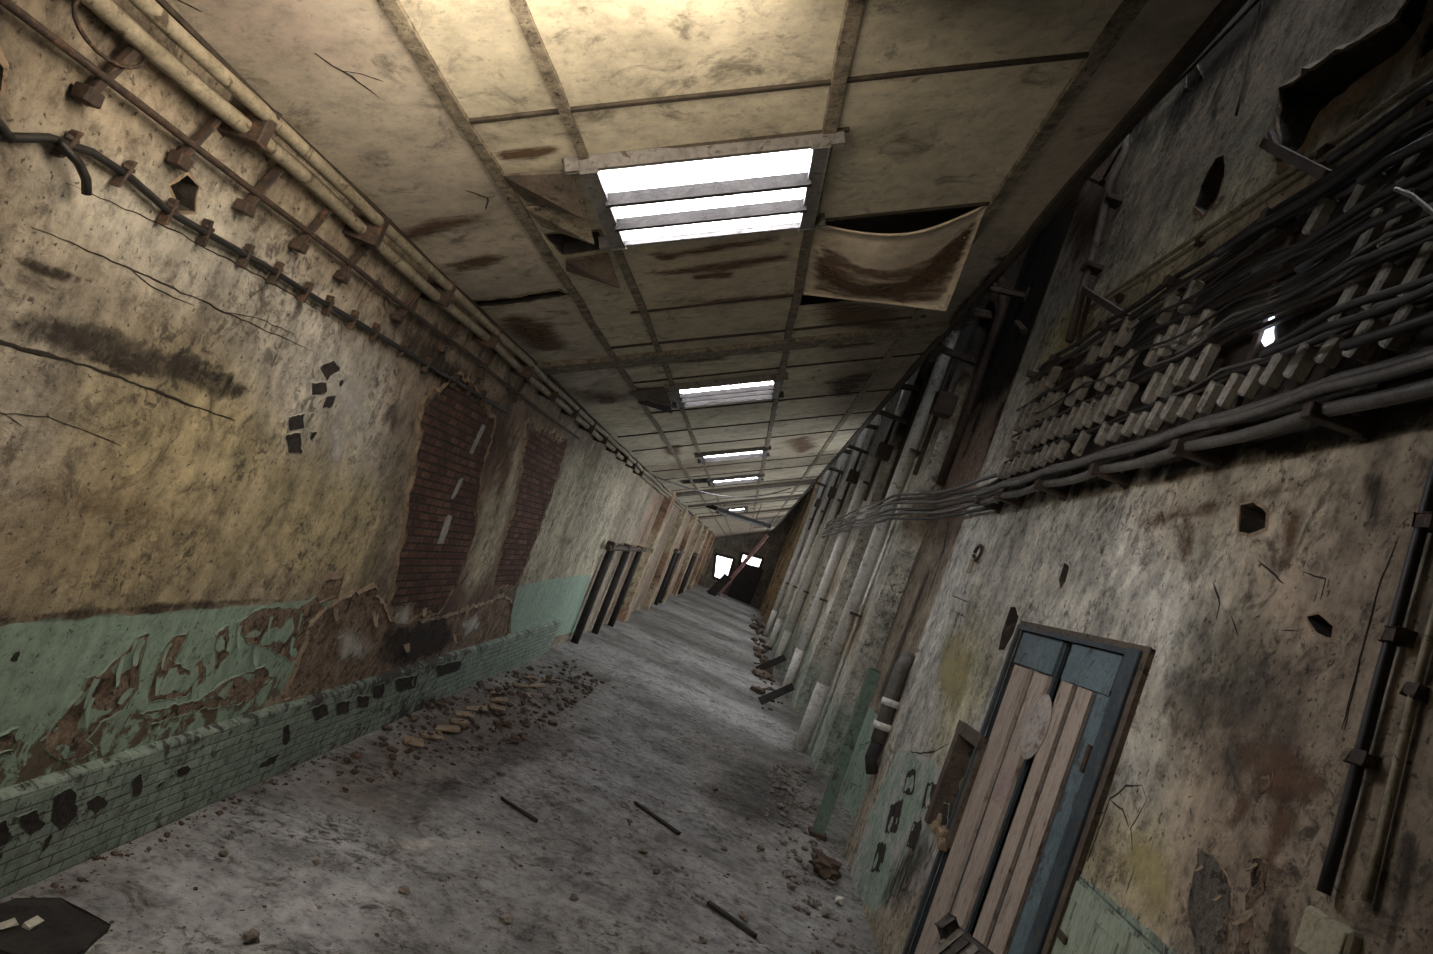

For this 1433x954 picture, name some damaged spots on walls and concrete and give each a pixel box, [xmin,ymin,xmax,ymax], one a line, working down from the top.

spalling [1271,0,1433,175]
crack [31,183,342,352]
water stain [655,239,786,280]
crack [0,340,235,421]
crack [0,412,121,446]
flaking render [39,370,568,769]
peeling [0,726,19,754]
peeling [130,764,193,800]
peeling [0,785,108,859]